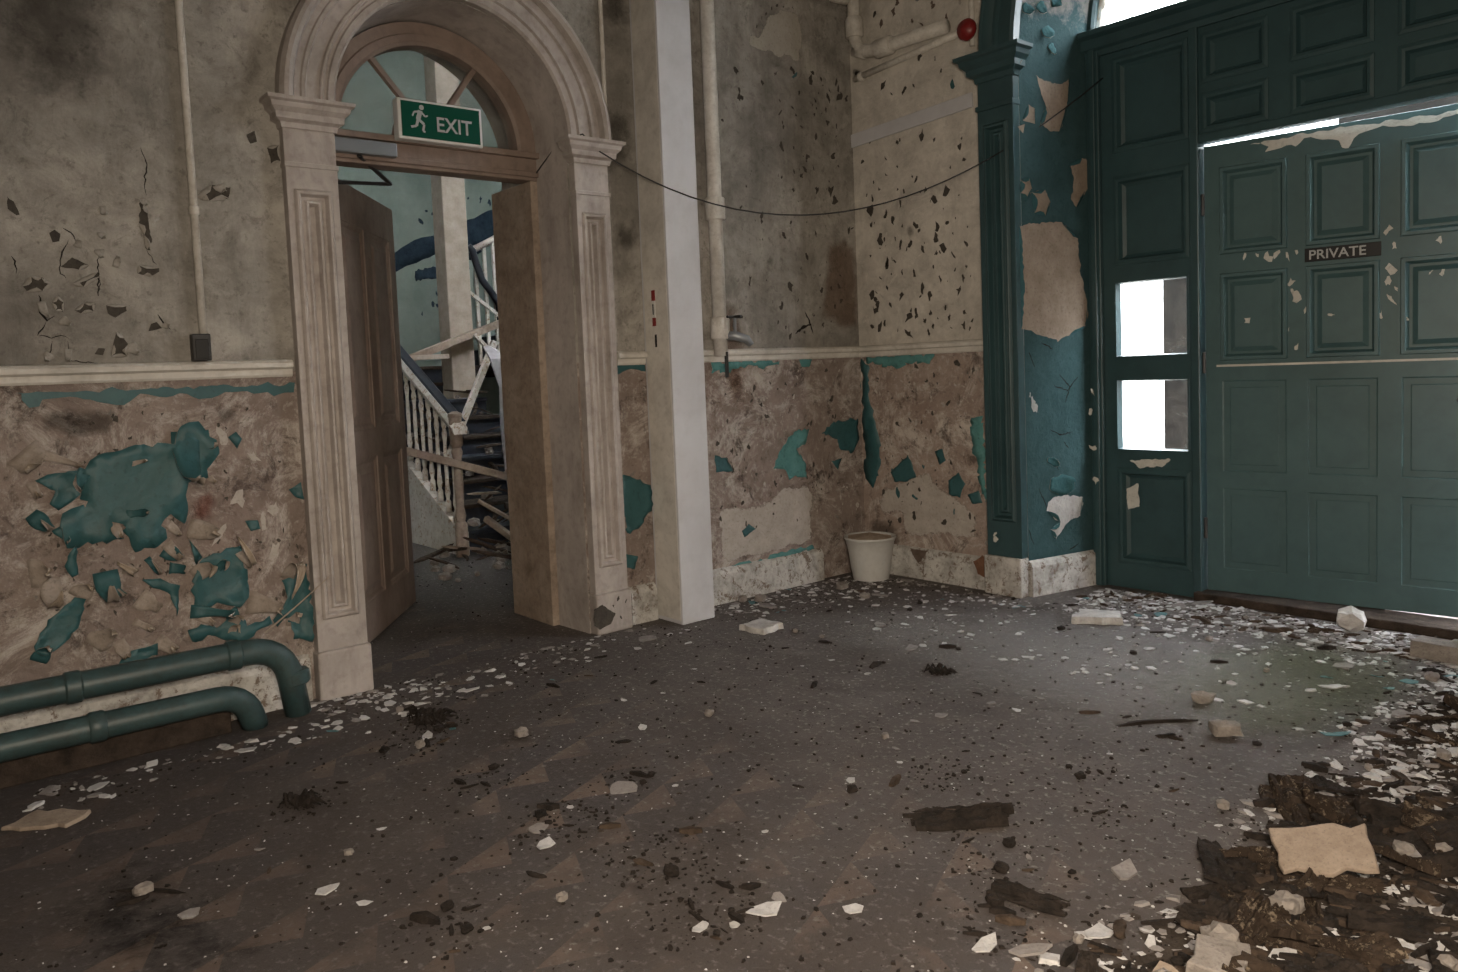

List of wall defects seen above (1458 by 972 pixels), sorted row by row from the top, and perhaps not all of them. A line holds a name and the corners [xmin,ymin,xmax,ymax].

peeling [873,0,948,28]
peeling [1022,0,1063,55]
flaking render [1018,75,1070,133]
peeling [761,66,848,205]
peeling [7,199,20,215]
flaking render [1069,158,1087,208]
peeling [22,198,170,358]
flaking render [1019,177,1088,341]
flaking render [711,137,987,566]
peeling [6,382,315,664]
peeling [973,532,998,577]